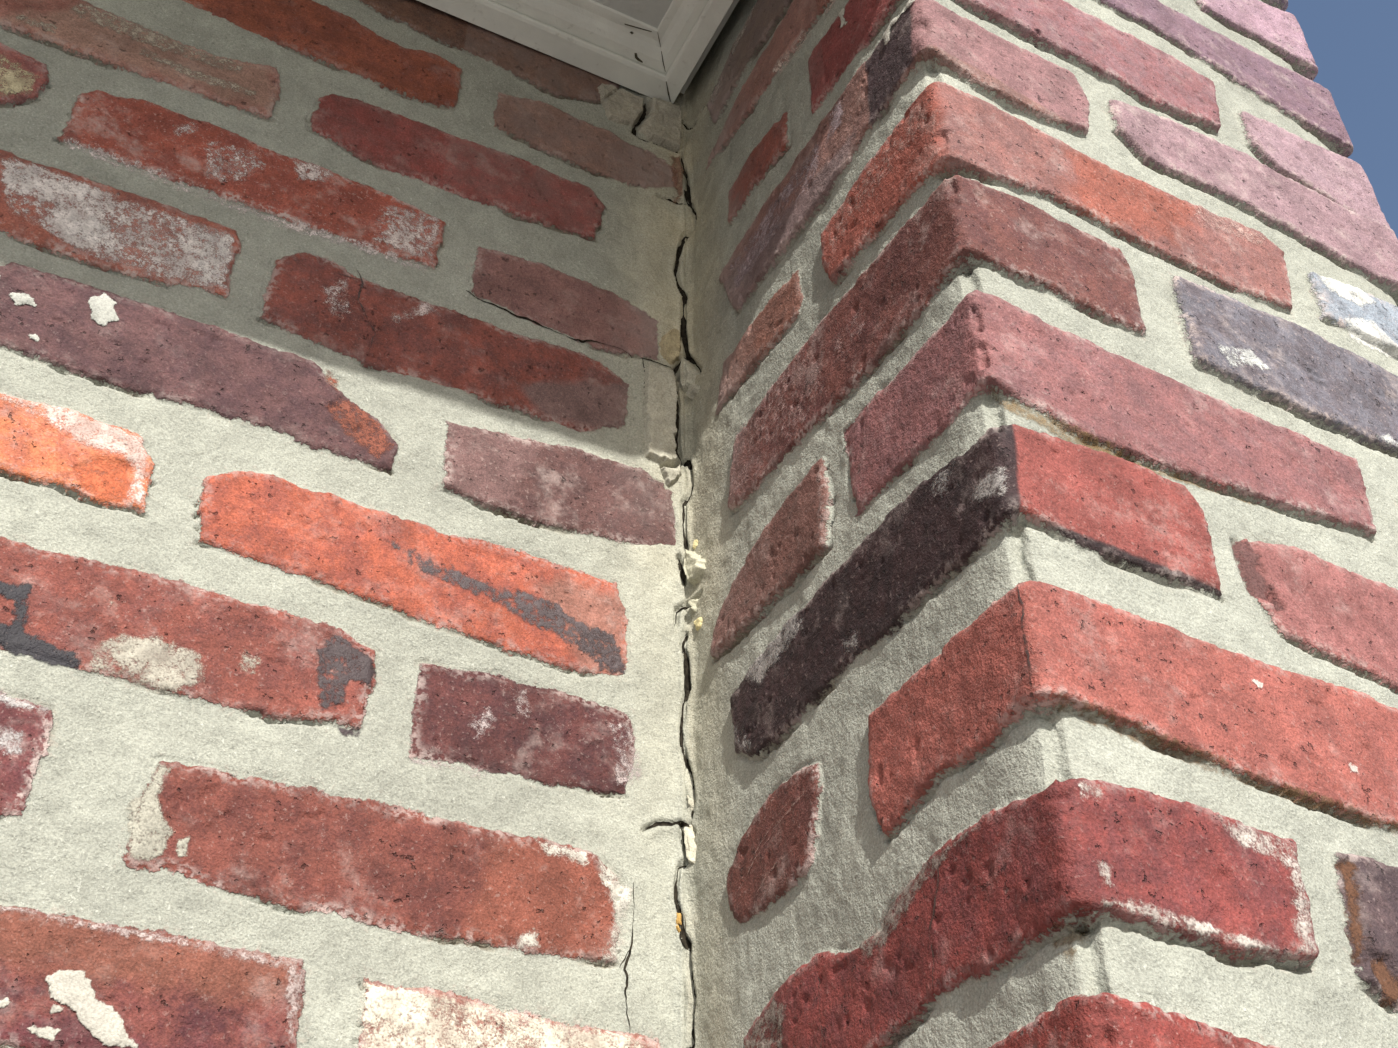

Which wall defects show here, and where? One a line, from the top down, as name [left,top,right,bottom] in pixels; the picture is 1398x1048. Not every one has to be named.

damp [65,138,189,192]
damp [207,142,266,180]
damp [295,162,331,182]
damp [1,159,234,287]
damp [209,197,439,269]
peeling [9,292,37,306]
crack [466,35,701,1048]
peeling [27,1005,63,1041]